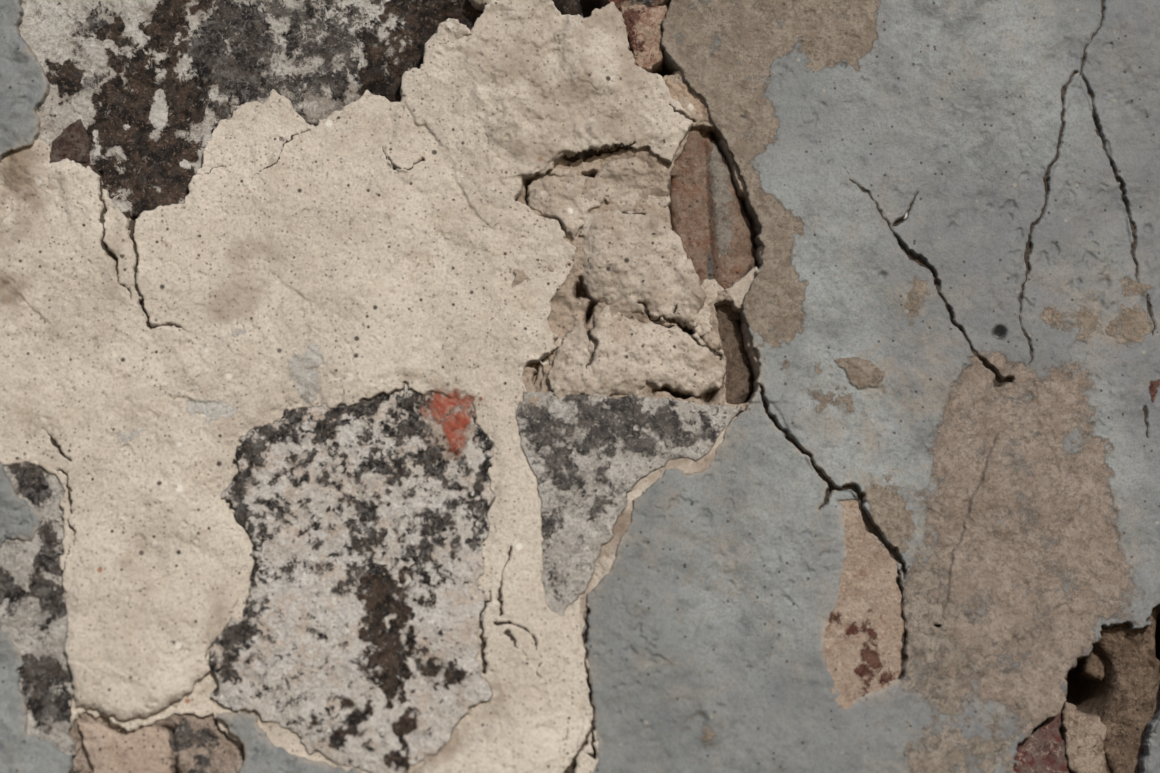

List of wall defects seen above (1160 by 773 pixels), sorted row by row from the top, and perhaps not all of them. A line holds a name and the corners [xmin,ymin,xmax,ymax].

crack [99,172,189,333]
spalling [0,0,885,773]
crack [479,546,542,677]
crack [564,608,596,773]
crack [759,385,907,679]
peeling [823,349,1160,773]
crack [845,0,1156,387]
crack [1141,406,1149,438]